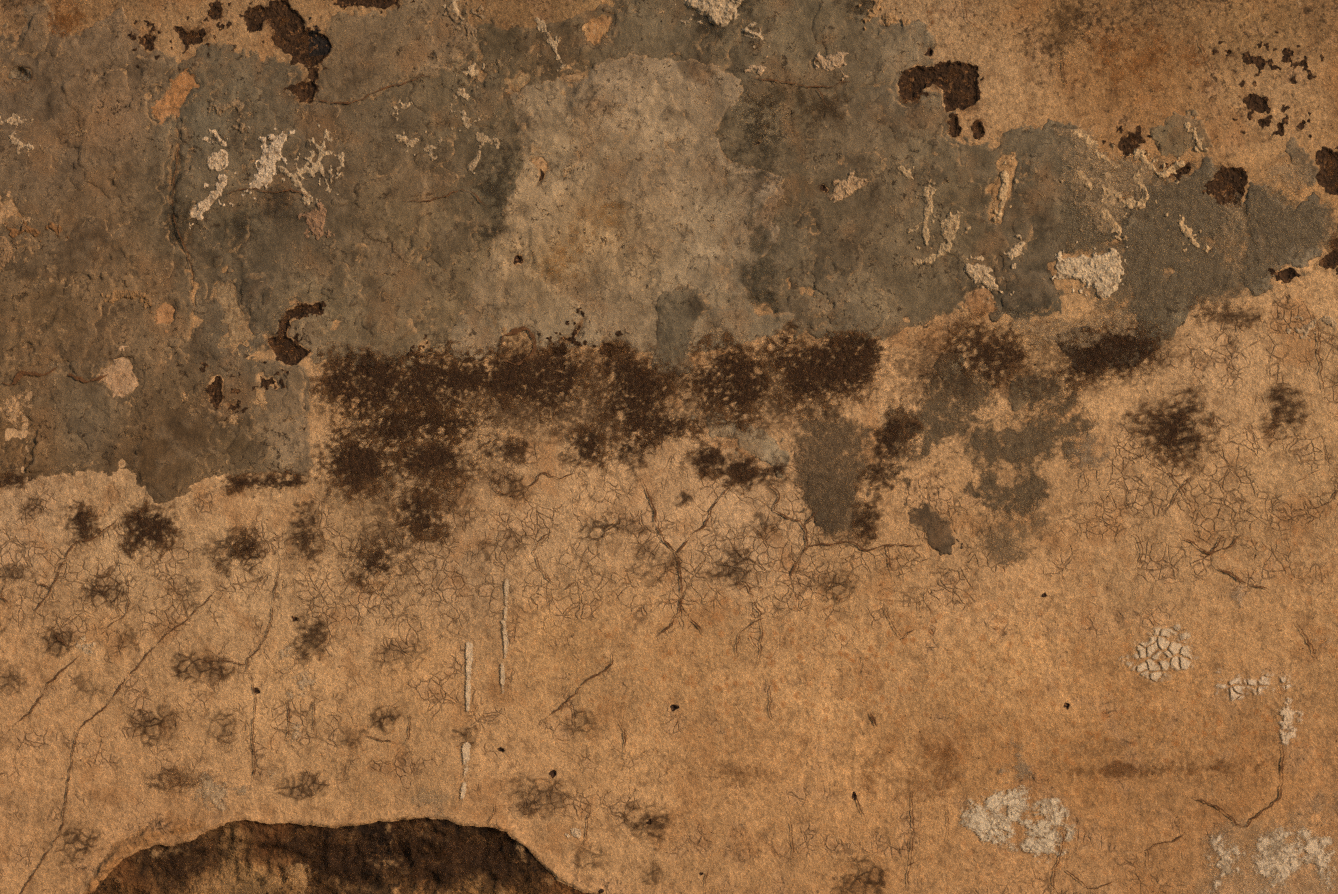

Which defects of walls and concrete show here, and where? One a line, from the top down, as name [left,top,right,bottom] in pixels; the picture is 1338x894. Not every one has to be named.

peeling [96,0,366,473]
peeling [898,47,1059,330]
spalling [1213,30,1338,195]
water stain [222,199,884,595]
crack [0,517,214,894]
crack [203,520,592,785]
flaking render [60,803,831,894]
crack [633,480,963,728]
water stain [960,742,1075,863]
water stain [1120,624,1194,681]
crack [1066,413,1338,631]
water stain [1207,827,1336,894]